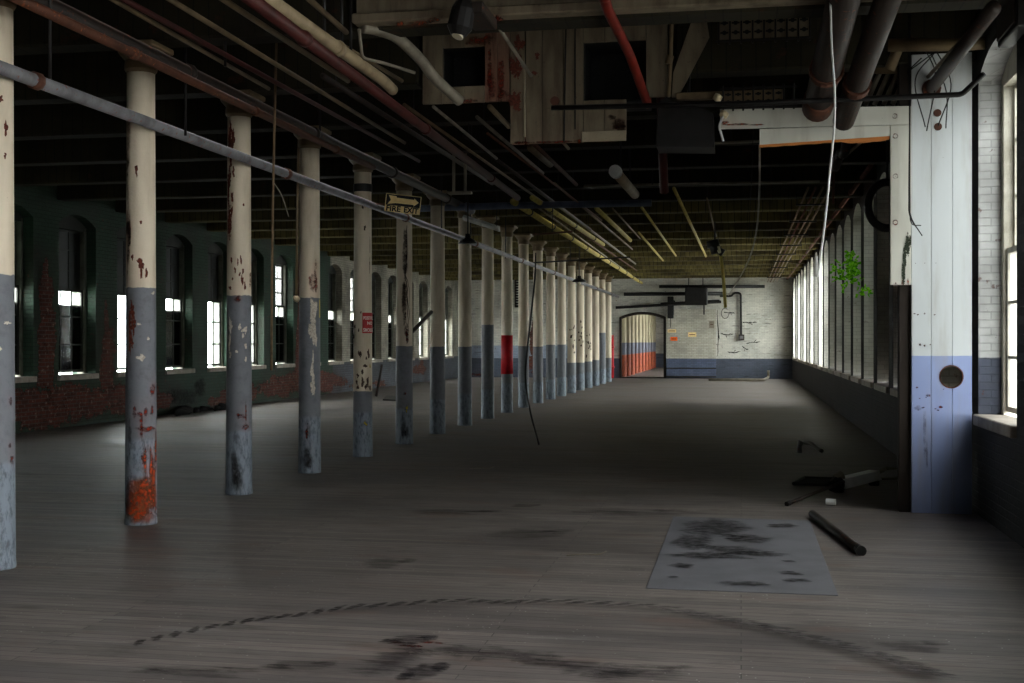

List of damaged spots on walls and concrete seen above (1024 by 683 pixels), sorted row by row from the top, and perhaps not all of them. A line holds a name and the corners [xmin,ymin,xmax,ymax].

peeling [15,257,145,433]
corrosion [125,385,157,522]
peeling [156,383,176,410]
peeling [252,260,371,400]